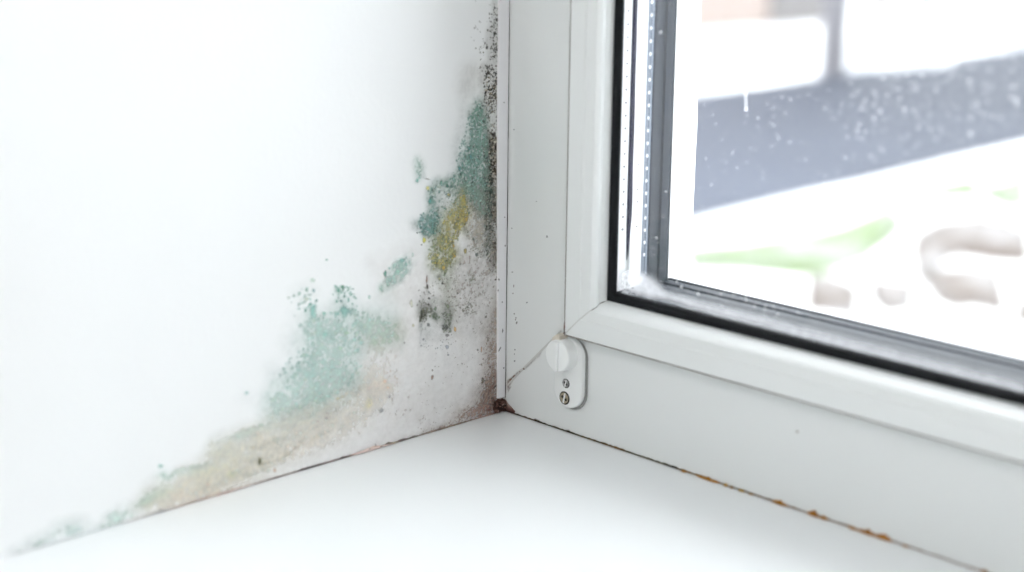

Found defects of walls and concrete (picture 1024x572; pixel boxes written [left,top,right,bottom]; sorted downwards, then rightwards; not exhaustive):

water stain [140,279,405,507]
water stain [381,7,524,432]